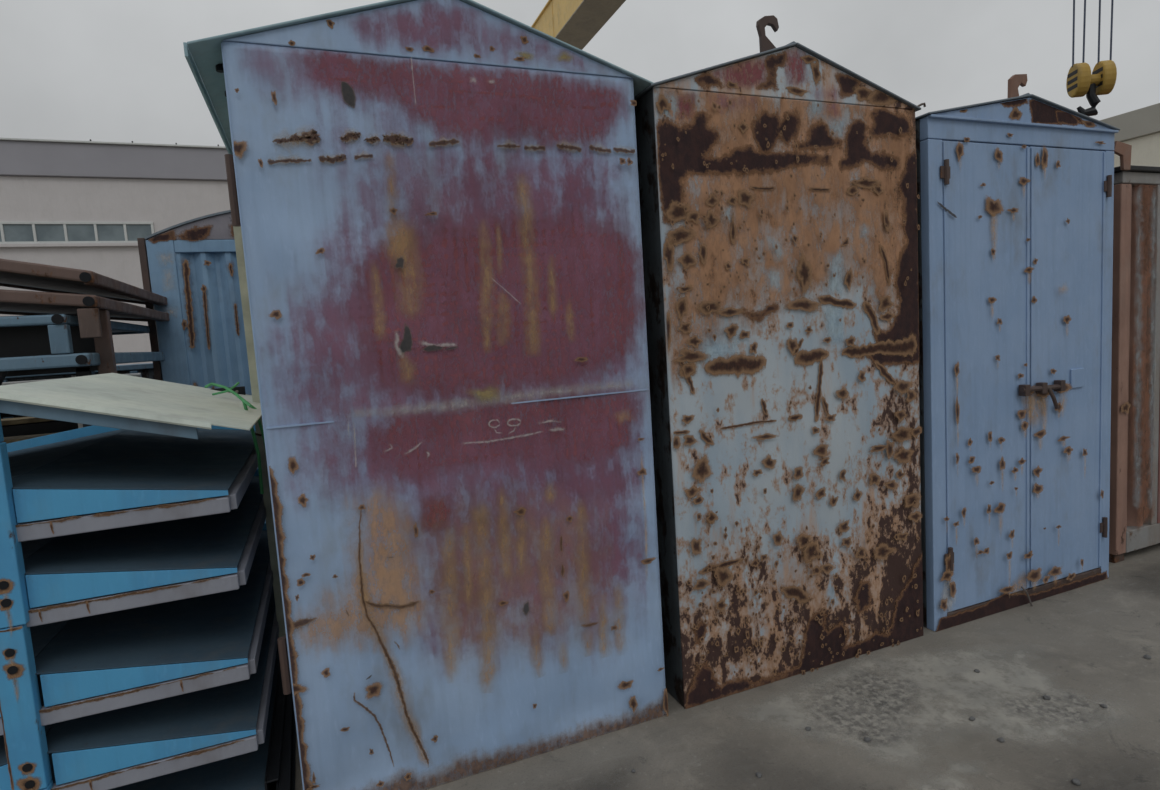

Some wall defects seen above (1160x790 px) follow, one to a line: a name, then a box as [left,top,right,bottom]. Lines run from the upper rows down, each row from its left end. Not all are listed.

corrosion [956,137,970,161]
corrosion [1000,99,1097,137]
corrosion [149,225,212,244]
corrosion [656,51,920,466]
corrosion [978,183,1018,255]
corrosion [182,260,210,350]
corrosion [288,457,299,474]
corrosion [1132,346,1153,526]
corrosion [309,499,420,641]
corrosion [673,415,1108,709]
corrosion [366,682,382,699]
corrosion [372,680,669,790]